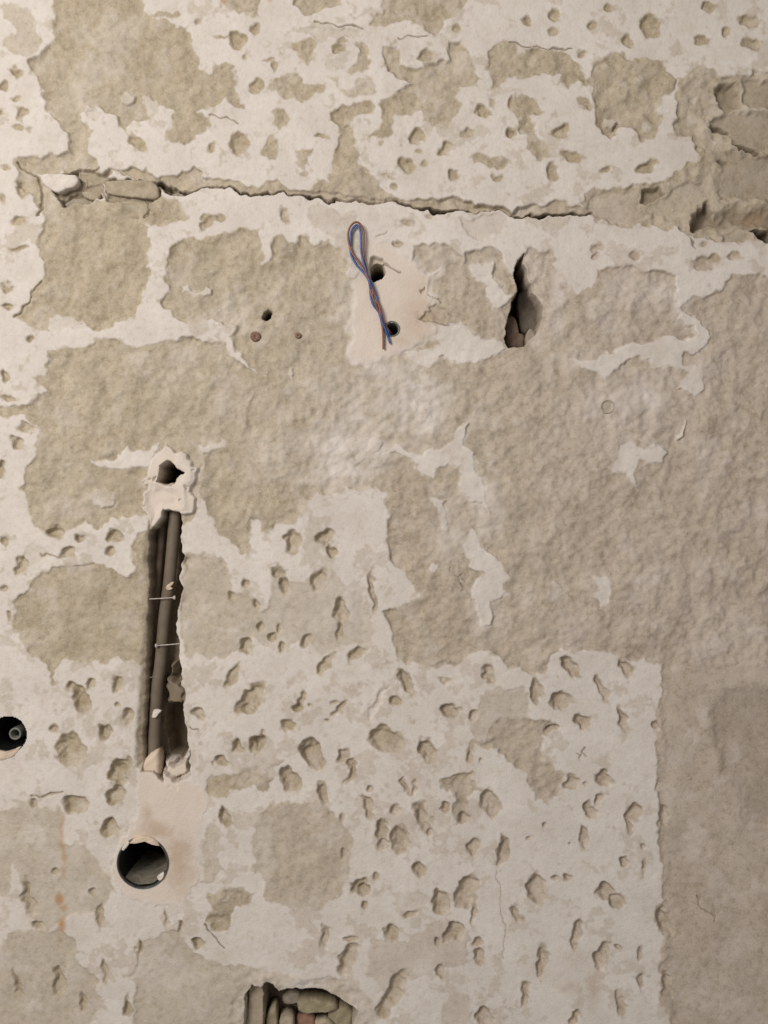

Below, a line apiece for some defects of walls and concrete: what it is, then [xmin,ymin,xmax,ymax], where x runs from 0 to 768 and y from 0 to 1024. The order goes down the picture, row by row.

spalling [0,0,246,343]
spalling [214,0,262,61]
spalling [229,131,251,158]
crack [18,163,594,220]
spalling [248,0,768,272]
spalling [0,212,768,1024]